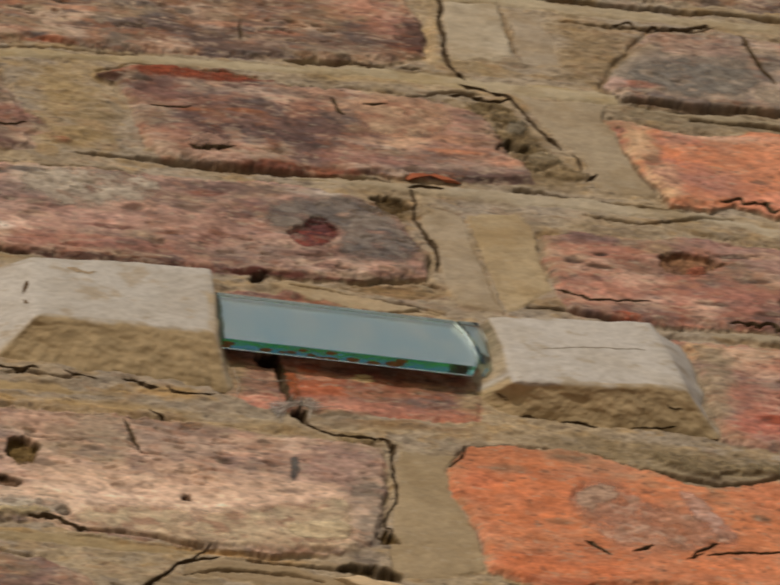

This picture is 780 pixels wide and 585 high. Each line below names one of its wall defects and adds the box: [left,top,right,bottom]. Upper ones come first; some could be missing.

crack [740,36,776,84]
crack [436,0,598,183]
crack [0,119,27,127]
crack [721,197,780,214]
spalling [288,217,339,246]
crack [409,184,445,273]
crack [556,289,649,302]
crack [730,321,780,333]
crack [268,354,399,545]
crack [145,544,221,585]